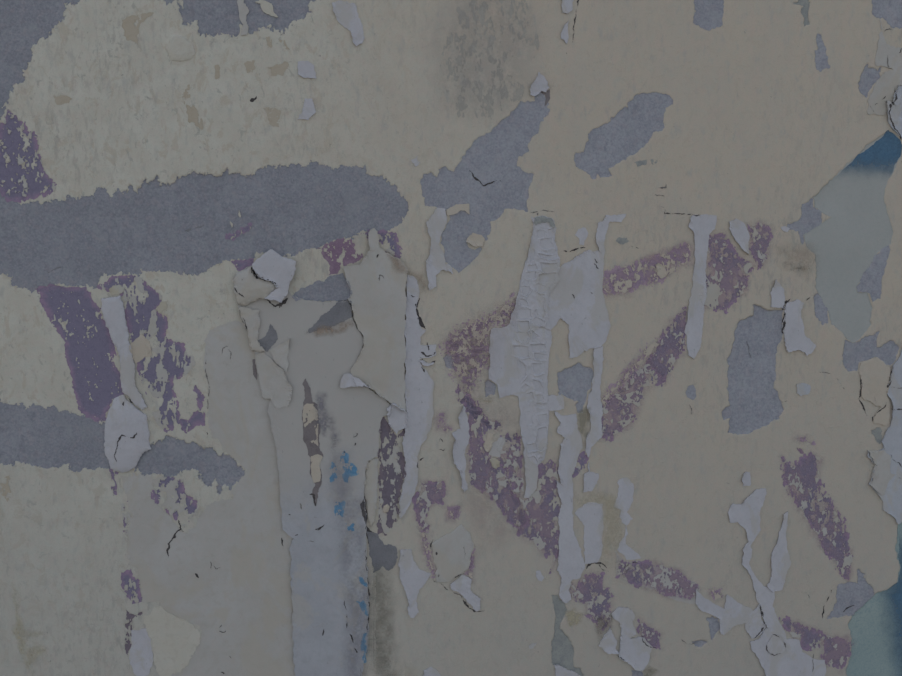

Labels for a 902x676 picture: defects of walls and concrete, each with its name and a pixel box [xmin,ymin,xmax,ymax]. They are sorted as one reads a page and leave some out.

peeling [0,0,80,125]
peeling [164,0,316,37]
peeling [574,92,673,179]
peeling [0,160,409,495]
peeling [364,72,550,618]
flaking render [684,214,717,359]
peeling [722,0,902,676]
flaking render [485,214,626,676]
crack [166,520,184,557]
flaking render [598,607,653,676]
flaking render [614,478,641,560]
flaking render [693,472,826,676]